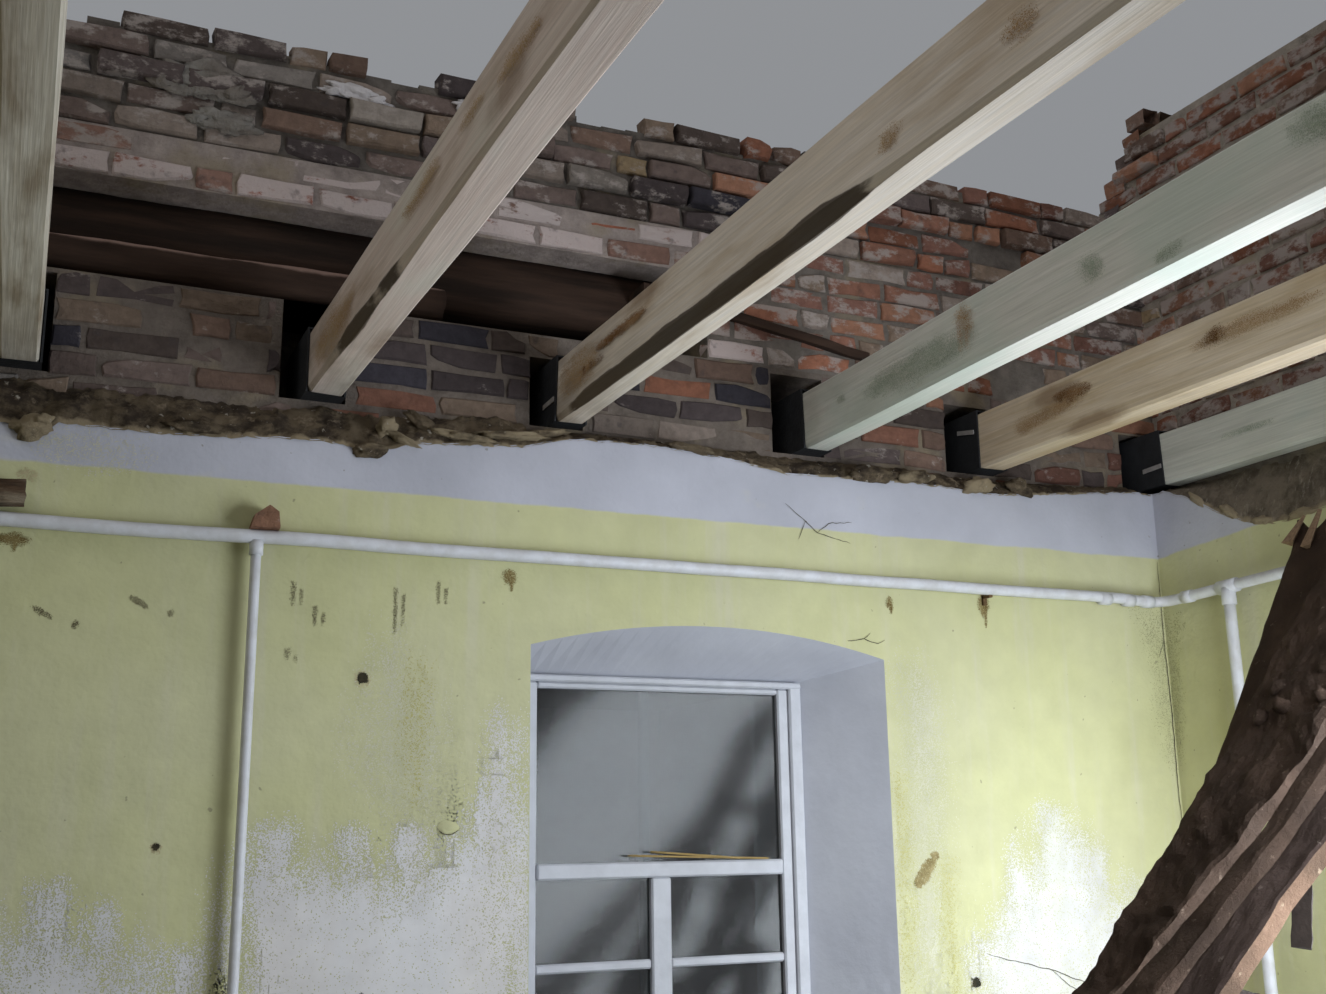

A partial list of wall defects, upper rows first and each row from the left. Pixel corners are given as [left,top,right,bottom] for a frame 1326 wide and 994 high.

spalling [0,377,1151,498]
flaking render [1188,492,1272,525]